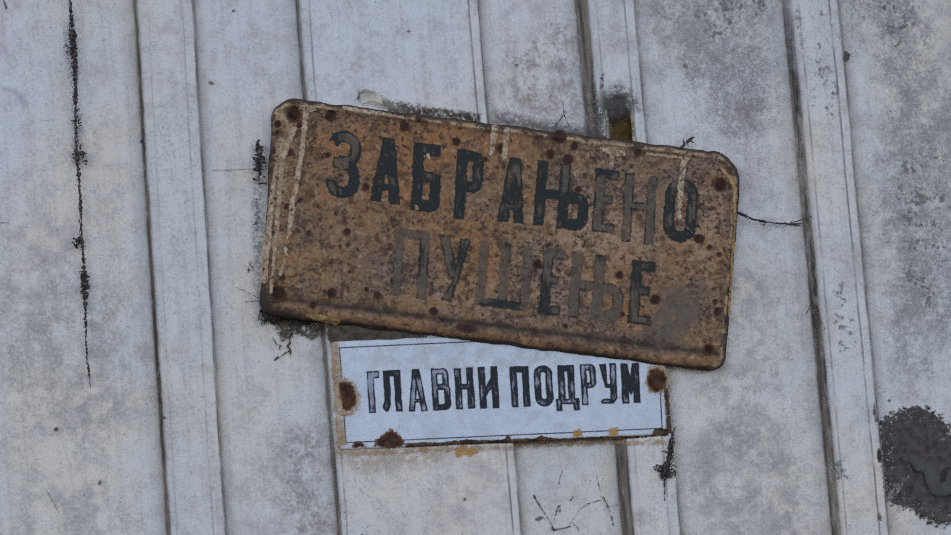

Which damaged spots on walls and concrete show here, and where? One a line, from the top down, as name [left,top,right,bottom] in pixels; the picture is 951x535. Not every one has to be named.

water stain [878,404,951,528]